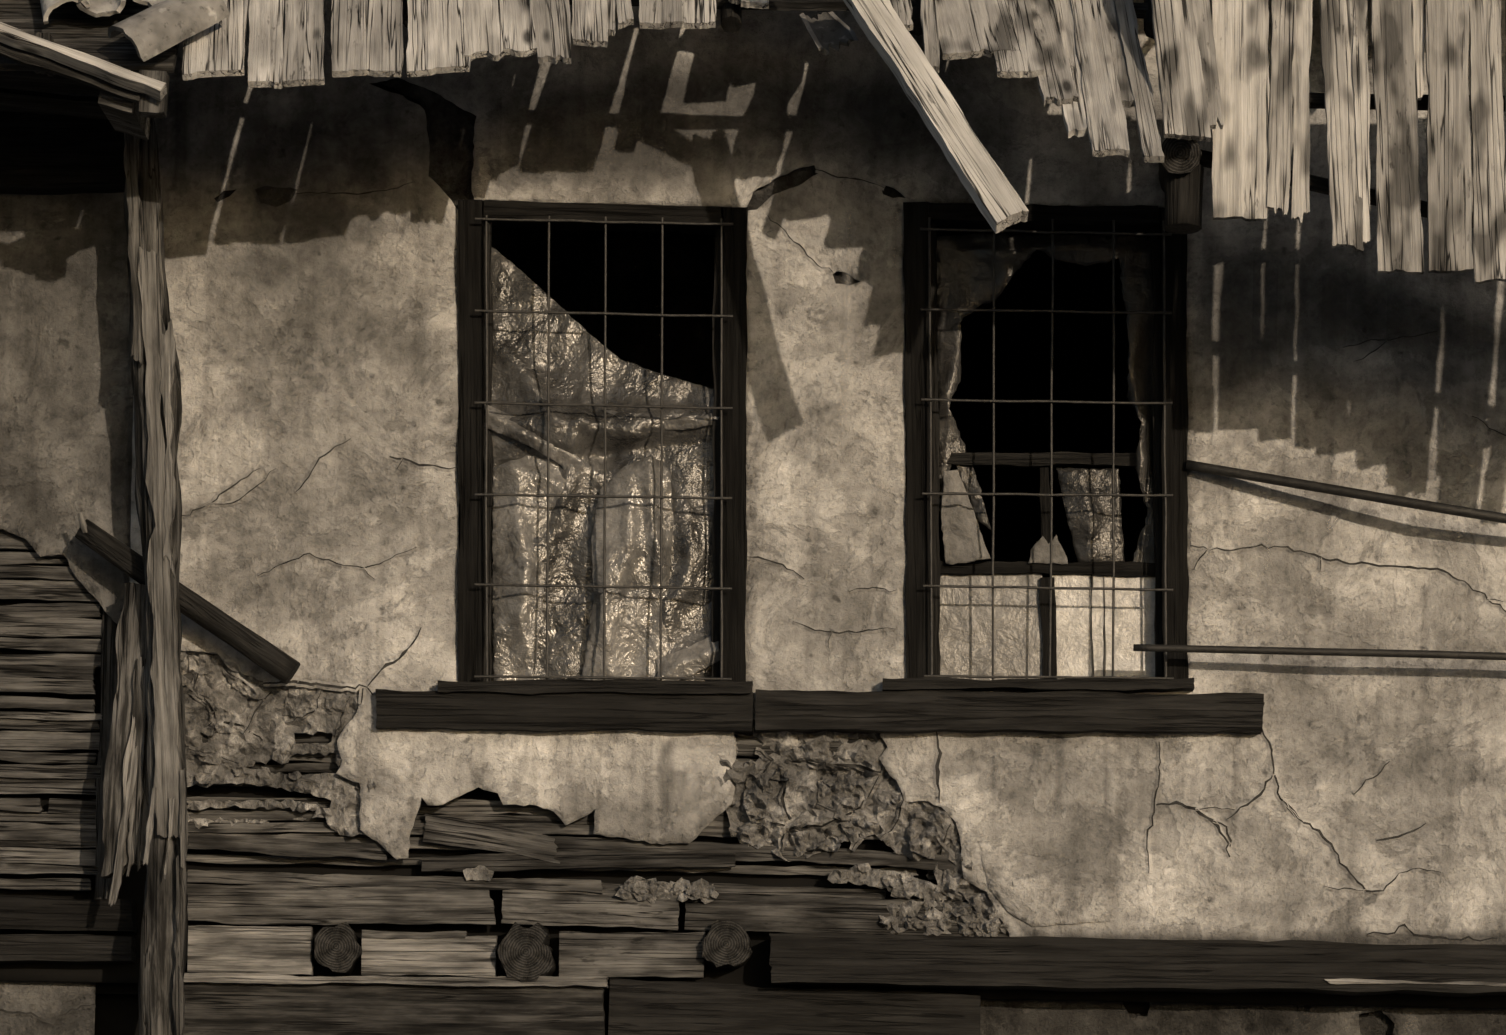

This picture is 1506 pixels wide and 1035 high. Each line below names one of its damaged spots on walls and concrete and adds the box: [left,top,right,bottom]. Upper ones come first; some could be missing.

crack [765,214,836,275]
crack [182,436,352,519]
crack [389,454,456,472]
crack [257,544,418,582]
crack [1190,541,1506,615]
crack [263,626,424,705]
spalling [181,651,377,837]
spalling [718,720,1008,937]
crack [1143,702,1489,944]
spalling [463,865,494,881]
spalling [615,876,719,904]